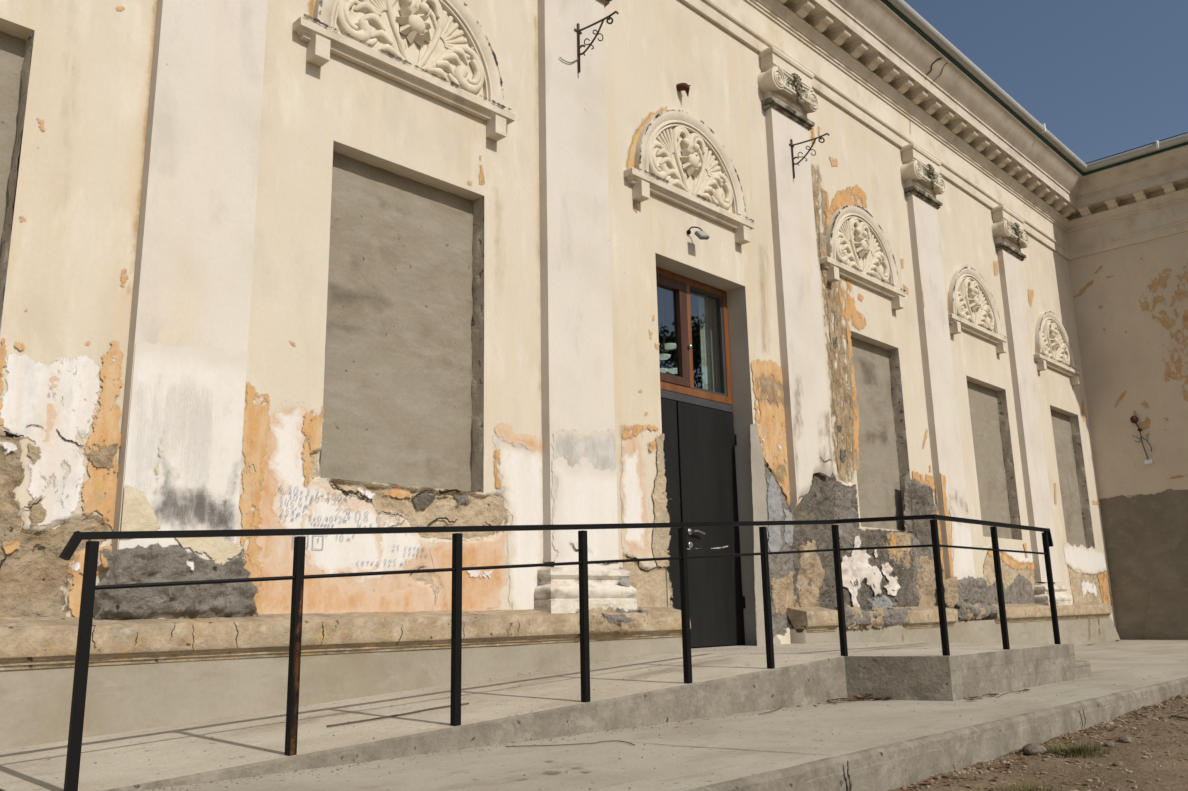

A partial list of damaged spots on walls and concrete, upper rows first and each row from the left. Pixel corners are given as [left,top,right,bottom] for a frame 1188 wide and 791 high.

crack [925,57,947,82]
peeling [830,185,867,218]
peeling [1139,263,1188,401]
spalling [0,338,285,619]
leakage [155,489,230,528]
spalling [311,451,509,542]
spalling [410,566,447,606]
peeling [467,566,493,578]
spalling [577,434,674,639]
spalling [751,232,1035,638]